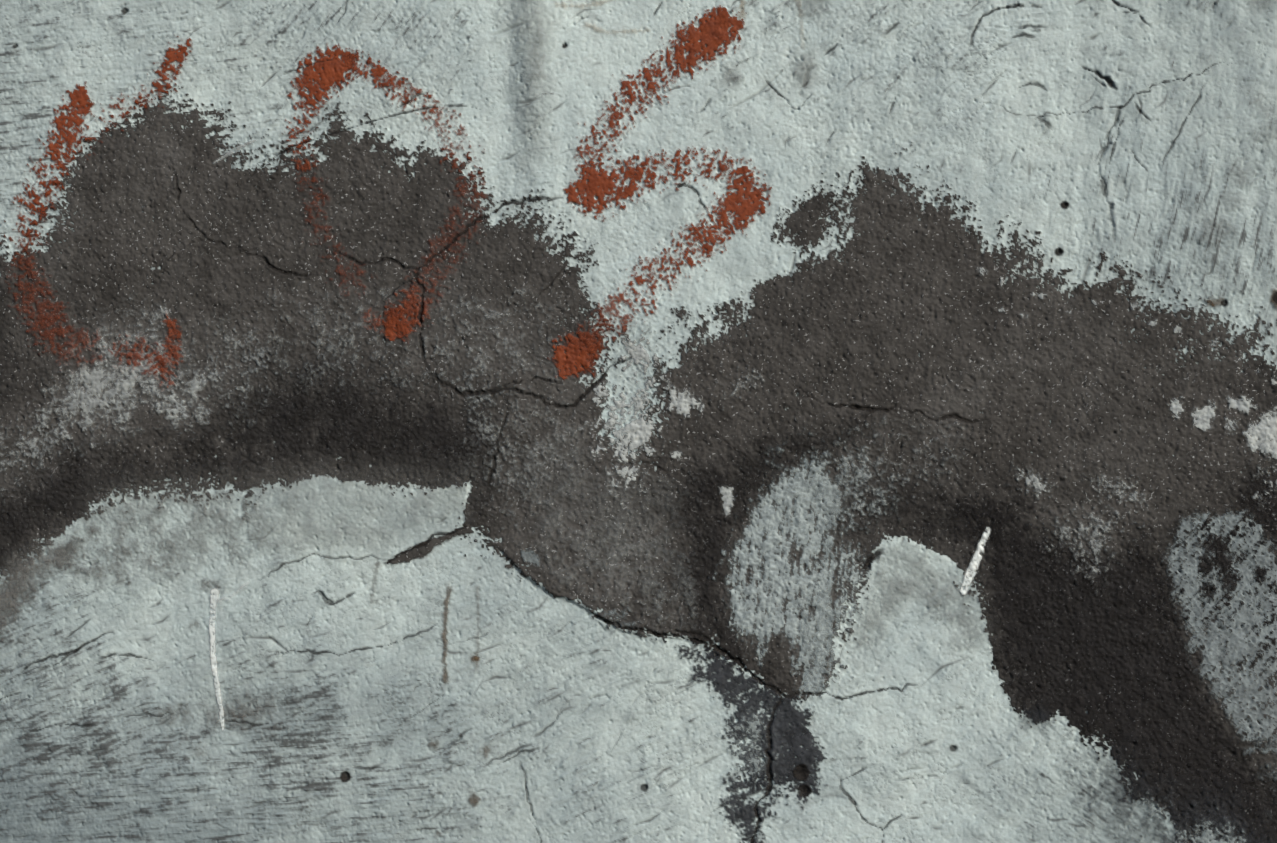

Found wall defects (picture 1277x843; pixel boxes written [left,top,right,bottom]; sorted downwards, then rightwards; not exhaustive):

crack [677,183,705,208]
crack [336,197,617,490]
crack [830,404,978,423]
crack [396,529,460,558]
crack [598,616,910,843]